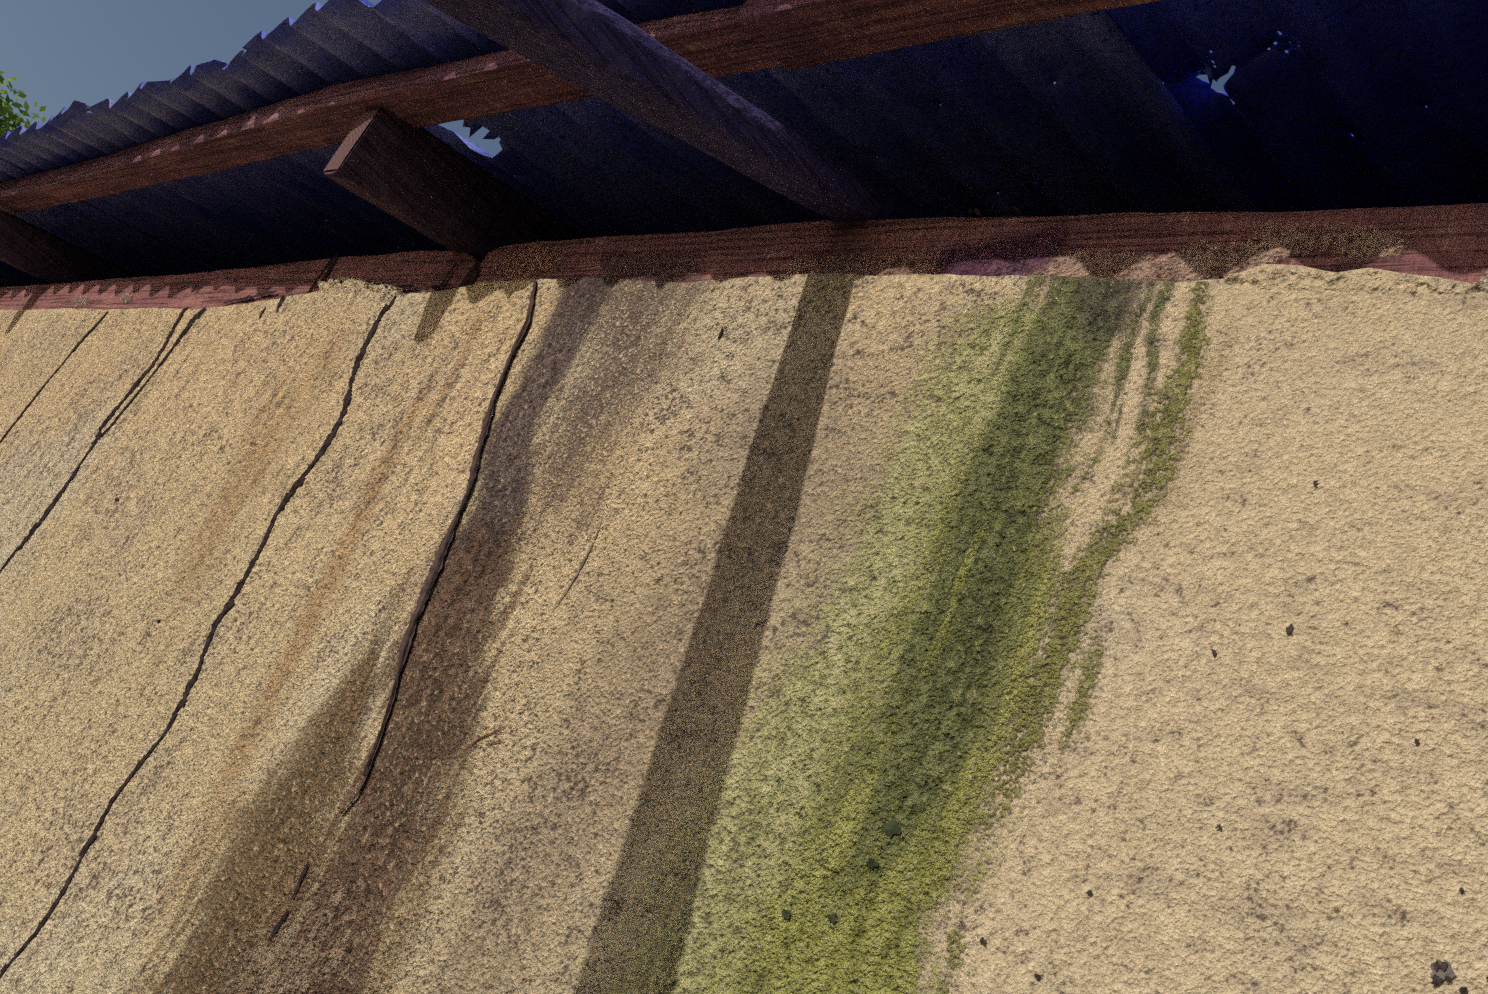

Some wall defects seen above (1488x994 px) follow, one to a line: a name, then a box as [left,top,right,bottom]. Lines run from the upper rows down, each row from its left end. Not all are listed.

crack [0,252,480,976]
damp [127,277,716,994]
crack [341,279,536,814]
damp [710,223,1212,994]